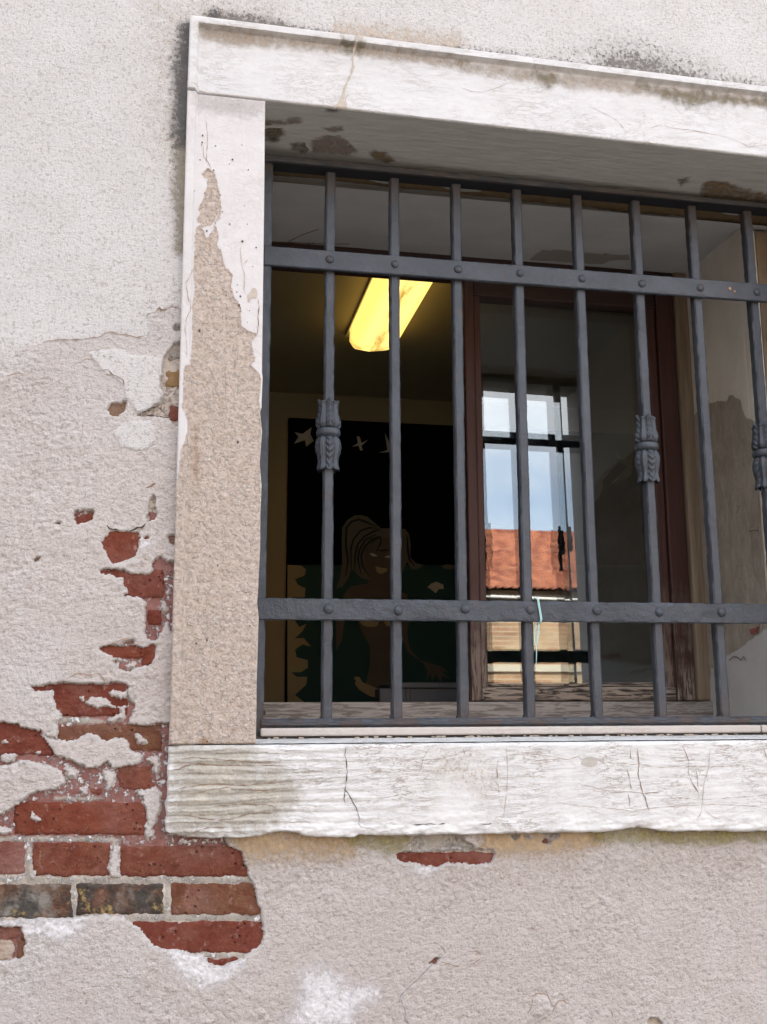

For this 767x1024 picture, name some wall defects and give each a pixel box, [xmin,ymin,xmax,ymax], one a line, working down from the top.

damp [204,31,272,46]
crack [334,34,360,110]
spalling [0,159,264,966]
crack [344,750,375,831]
crack [627,750,657,807]
crack [684,749,719,819]
spalling [396,834,494,867]